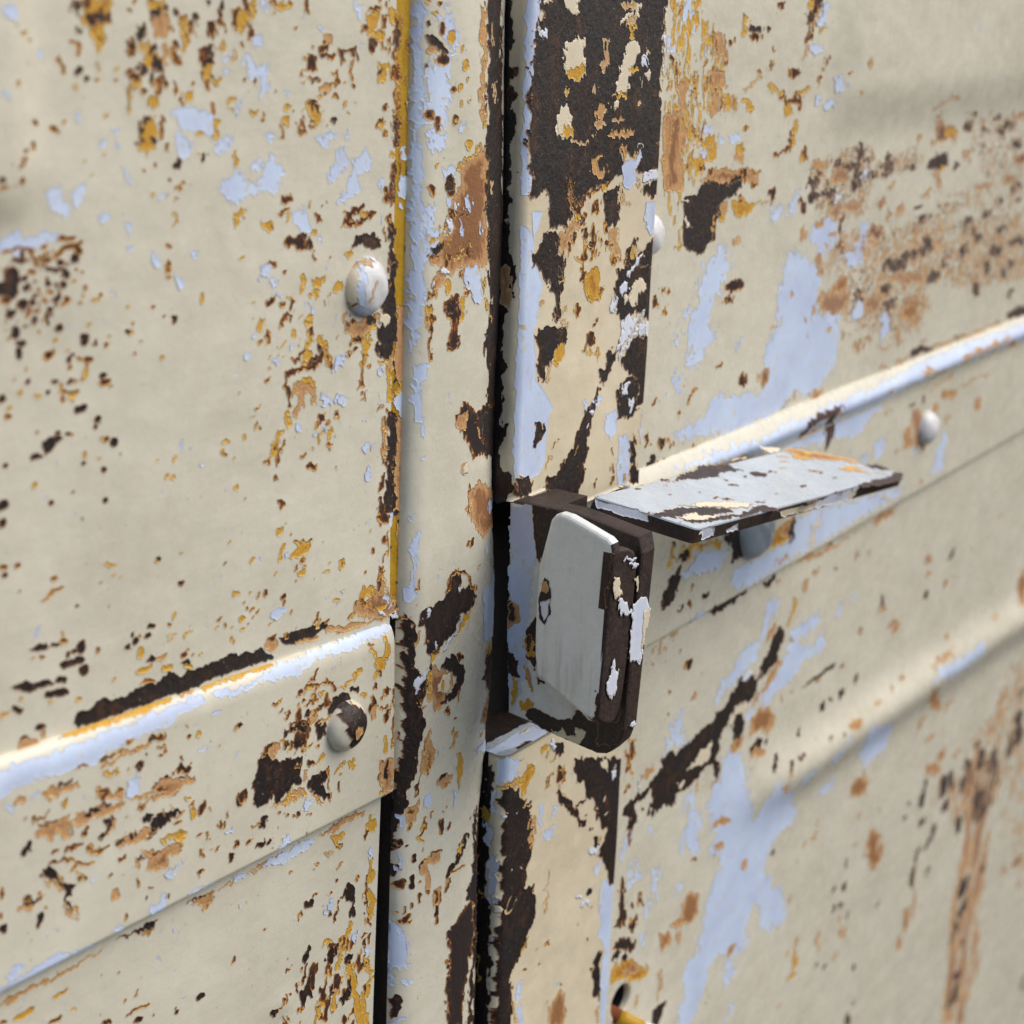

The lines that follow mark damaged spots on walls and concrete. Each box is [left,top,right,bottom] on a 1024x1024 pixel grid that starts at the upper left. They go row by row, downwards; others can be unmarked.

corrosion [423,0,519,504]
corrosion [532,179,622,326]
peeling [512,0,1024,486]
corrosion [660,0,1024,355]
corrosion [0,630,101,719]
peeling [0,0,478,877]
peeling [187,753,366,912]
corrosion [262,635,395,797]
corrosion [390,574,517,1024]
peeling [456,401,495,460]
peeling [465,479,493,539]
peeling [485,435,908,1024]